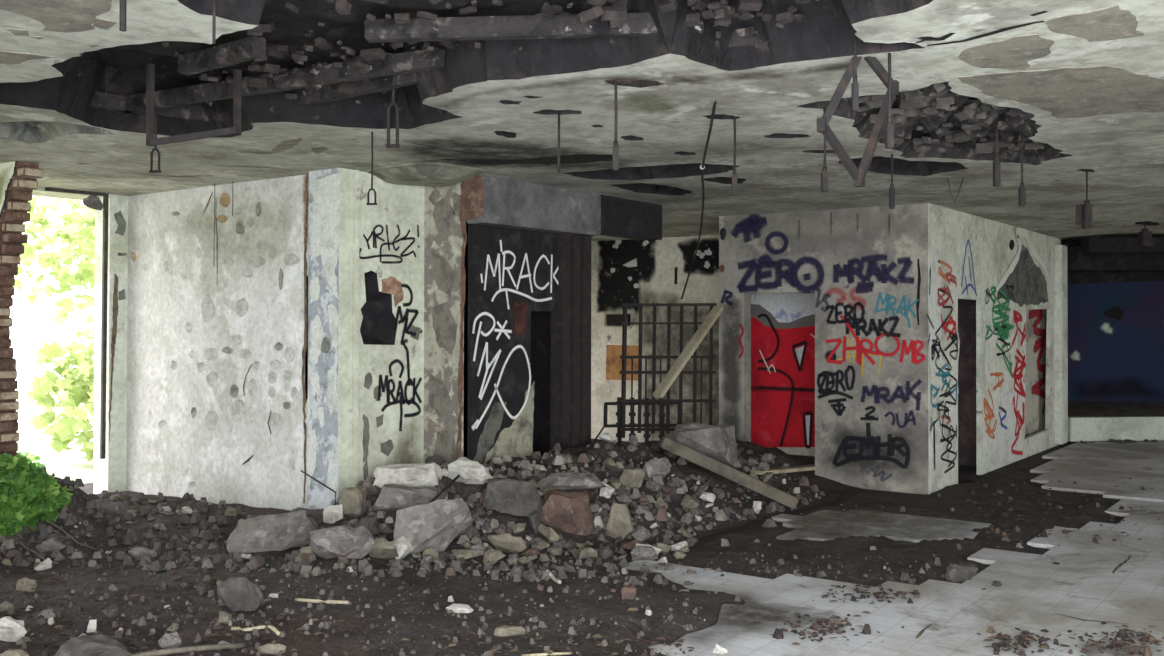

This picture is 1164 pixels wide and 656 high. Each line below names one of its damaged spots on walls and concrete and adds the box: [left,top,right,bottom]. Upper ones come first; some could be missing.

spalling [0,0,945,155]
peeling [764,4,1164,176]
flaking render [0,167,43,457]
spalling [108,274,126,442]
spalling [114,211,126,236]
flaking render [163,260,216,333]
peeling [189,173,342,505]